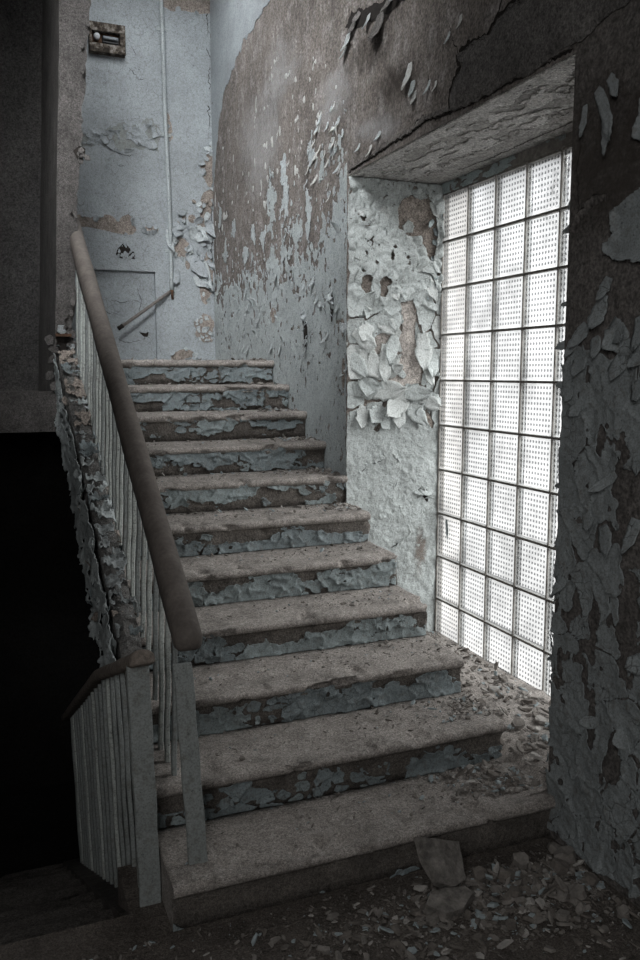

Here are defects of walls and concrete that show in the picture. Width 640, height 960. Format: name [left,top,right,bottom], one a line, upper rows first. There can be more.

crack [347,0,573,173]
peeling [631,98,640,141]
crack [408,107,607,233]
peeling [73,0,619,509]
peeling [602,187,640,263]
peeling [44,325,159,668]
peeling [175,526,369,557]
peeling [188,559,397,607]
peeling [545,276,640,899]
peeling [143,614,426,672]
peeling [196,670,461,737]
peeling [203,762,390,821]